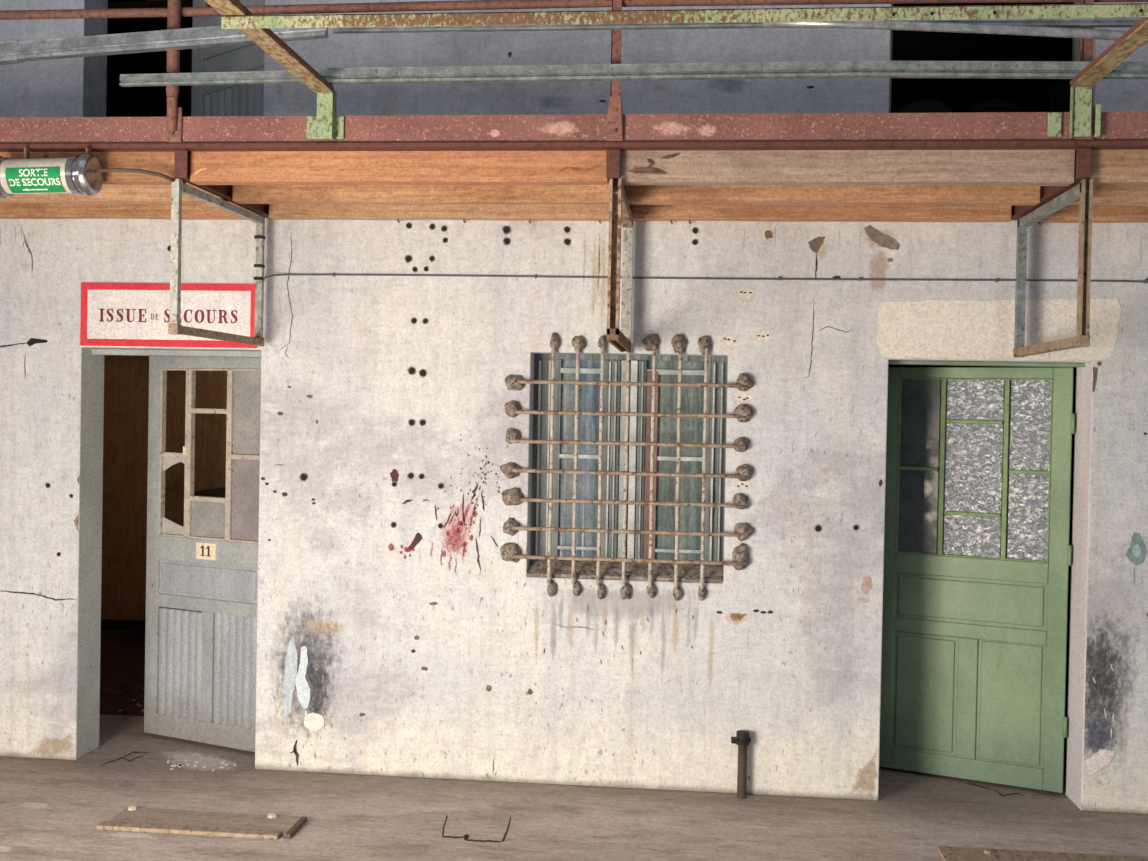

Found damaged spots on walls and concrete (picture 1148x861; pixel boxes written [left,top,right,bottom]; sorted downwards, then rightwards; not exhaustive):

crack [0,338,48,378]
crack [1,591,78,601]